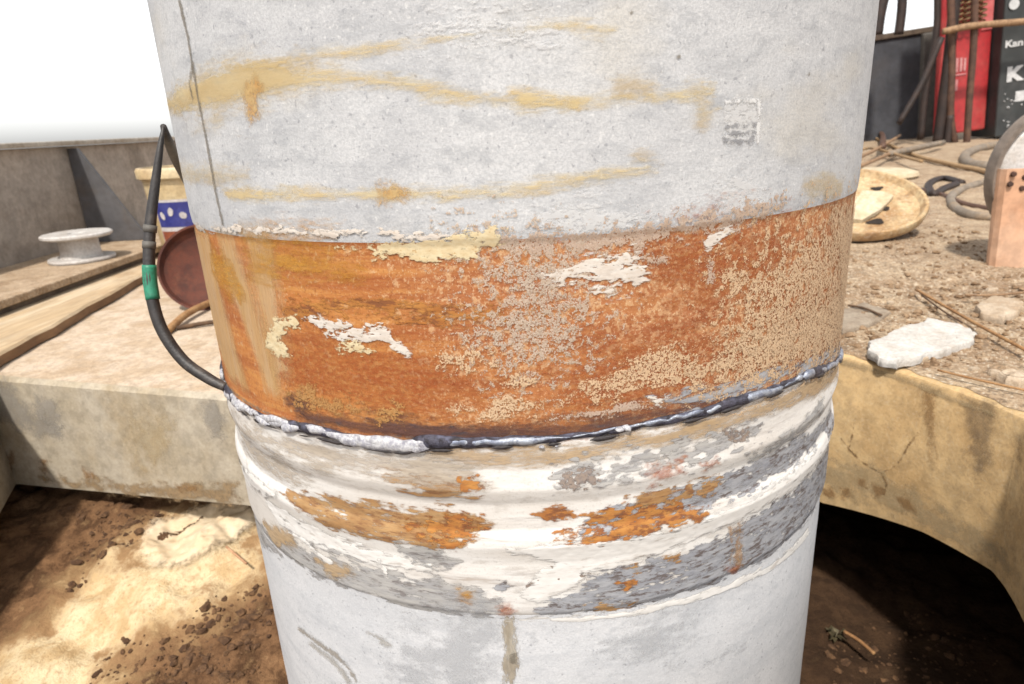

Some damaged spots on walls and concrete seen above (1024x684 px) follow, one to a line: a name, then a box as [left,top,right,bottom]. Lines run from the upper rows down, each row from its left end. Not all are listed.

crack [841,434,915,494]